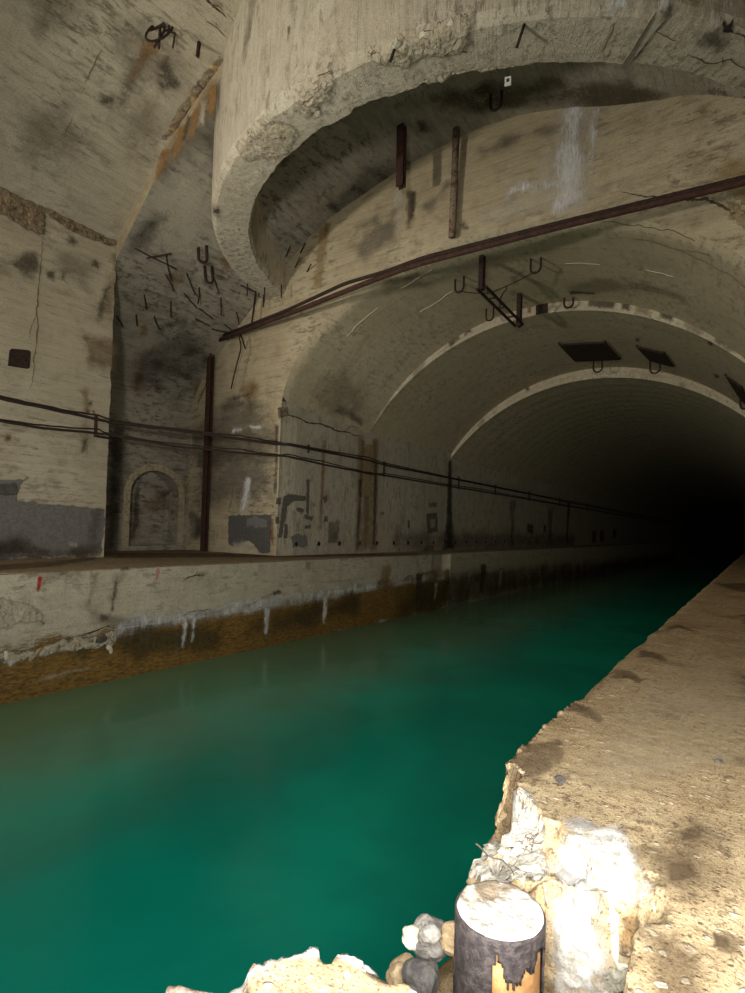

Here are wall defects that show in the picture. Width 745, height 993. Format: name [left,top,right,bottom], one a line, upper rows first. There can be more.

spalling [367,11,475,69]
spalling [404,65,515,91]
spalling [236,116,300,161]
water stain [435,79,659,213]
spalling [0,187,117,246]
water stain [0,554,675,705]
spalling [469,786,549,904]
spalling [602,953,631,993]